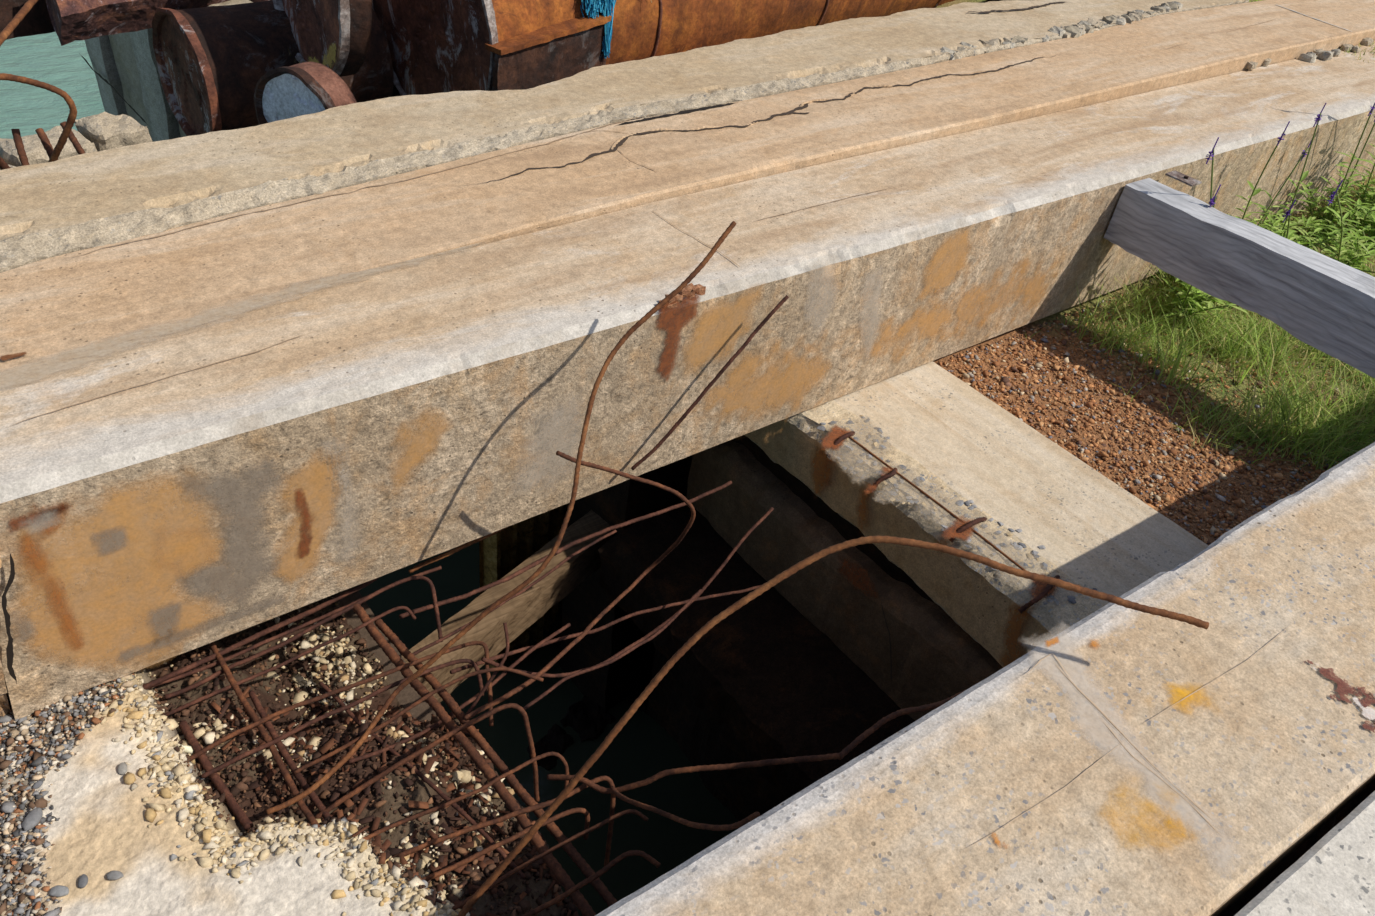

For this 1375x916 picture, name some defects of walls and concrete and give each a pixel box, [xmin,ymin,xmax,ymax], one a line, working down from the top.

crack [31,56,1054,268]
corrosion [656,283,706,380]
crack [2,554,17,684]
corrosion [9,504,82,648]
spalling [142,221,1209,916]
corrosion [939,518,974,546]
corrosion [1000,581,1057,667]